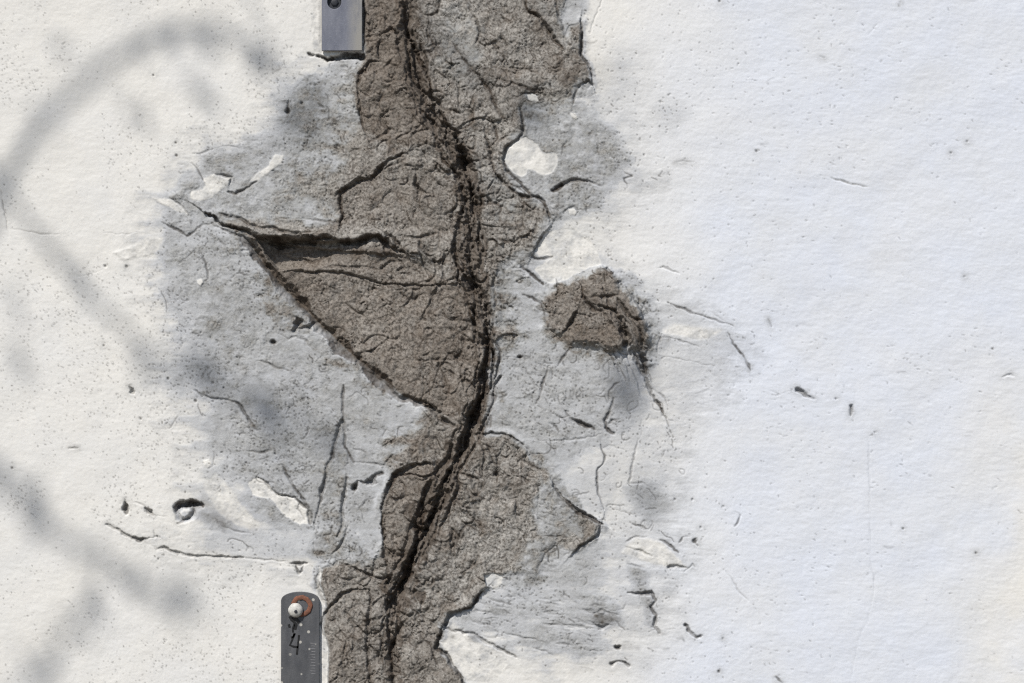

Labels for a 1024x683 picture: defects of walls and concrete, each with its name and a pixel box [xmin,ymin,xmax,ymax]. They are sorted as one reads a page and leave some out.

peeling [311,0,323,54]
spalling [221,27,458,283]
spalling [420,0,603,284]
peeling [155,175,230,214]
crack [103,0,752,683]
spalling [415,408,448,456]
peeling [203,460,254,522]
peeling [249,479,309,525]
spalling [315,443,427,683]
spalling [404,435,600,683]
spalling [592,601,703,668]